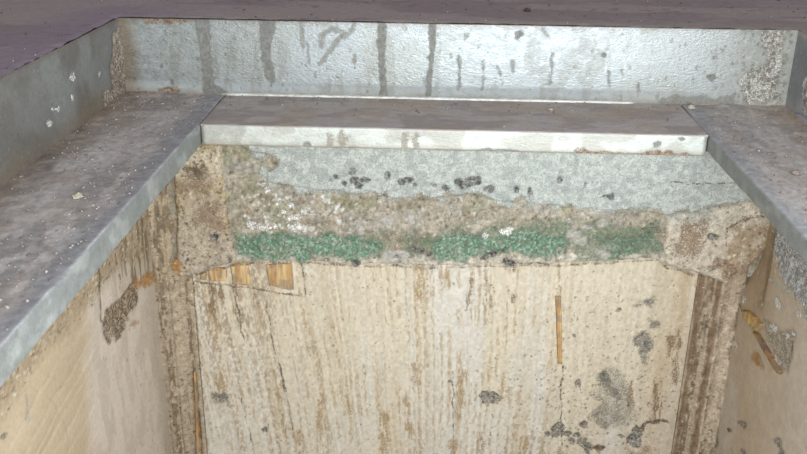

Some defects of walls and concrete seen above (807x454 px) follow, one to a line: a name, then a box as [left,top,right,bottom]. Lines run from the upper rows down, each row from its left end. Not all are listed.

damp [195,20,226,94]
damp [260,21,275,86]
damp [300,22,355,66]
damp [377,23,387,96]
damp [426,24,436,96]
peeling [249,141,752,218]
spalling [480,248,516,266]
peeling [774,229,807,318]
damp [666,331,683,385]